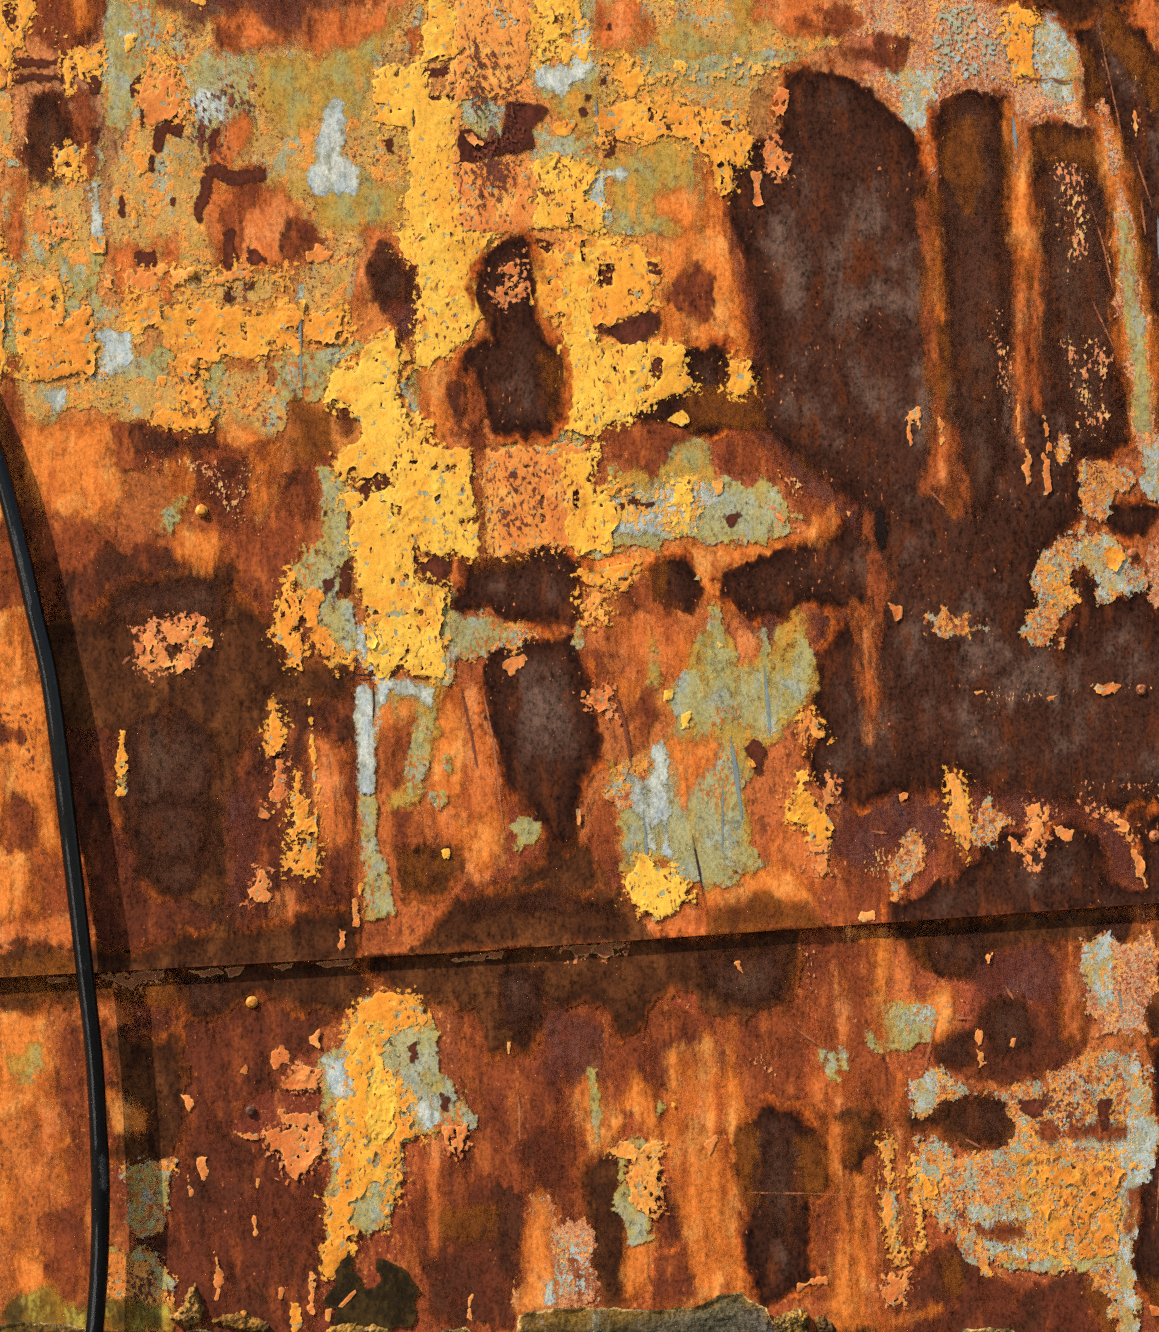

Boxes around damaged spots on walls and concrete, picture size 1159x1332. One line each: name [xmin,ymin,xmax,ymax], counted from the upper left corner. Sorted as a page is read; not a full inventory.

rust [118,195,126,218]
rust [344,225,422,344]
rust [384,138,394,154]
peeling [0,0,1159,929]
rust [413,0,1159,881]
rust [0,506,91,1301]
rust [19,394,1159,1332]
leakage [105,1297,174,1332]
peeling [180,1094,194,1111]
peeling [235,985,478,1332]
peeling [866,929,1159,1332]